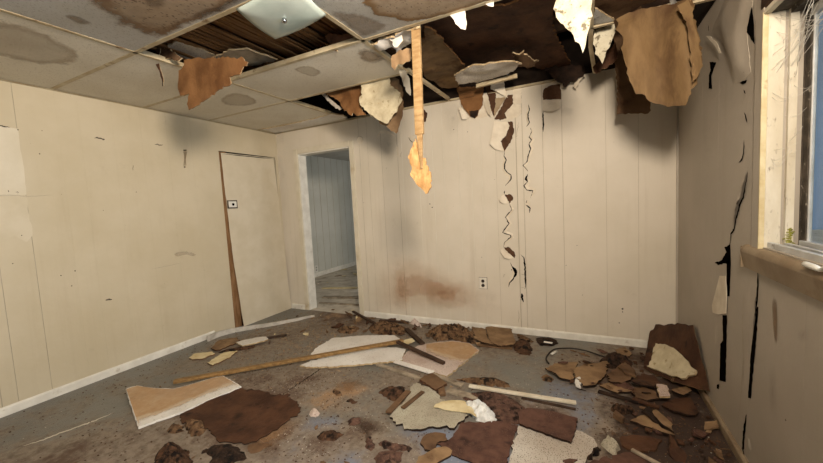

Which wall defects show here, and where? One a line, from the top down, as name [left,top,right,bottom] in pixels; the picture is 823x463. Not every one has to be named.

leakage [92,0,233,35]
leakage [340,0,490,34]
peeling [450,11,467,30]
spalling [456,79,522,152]
spalling [542,84,562,130]
crack [499,105,536,322]
crack [712,147,748,389]
crack [742,273,759,455]